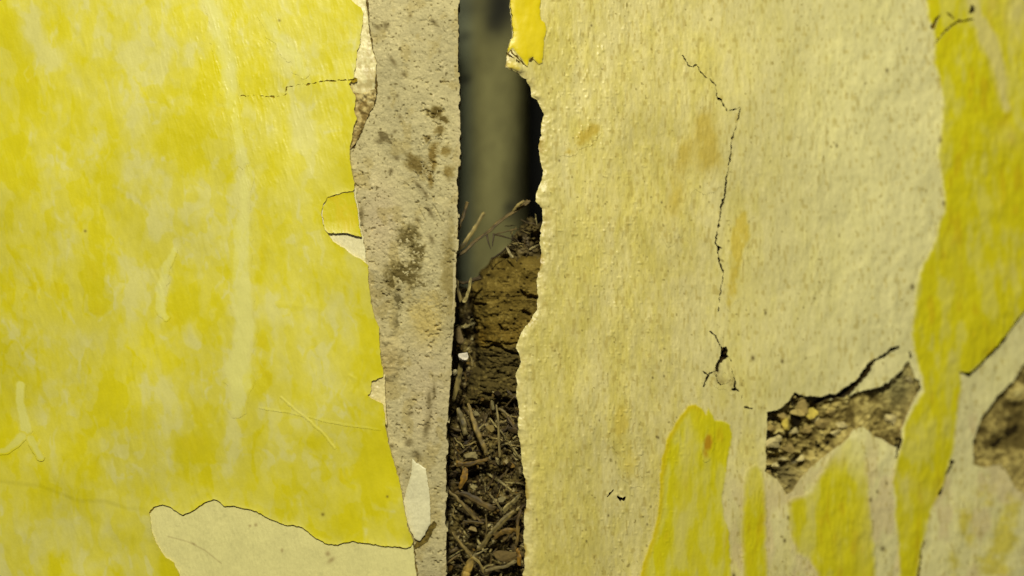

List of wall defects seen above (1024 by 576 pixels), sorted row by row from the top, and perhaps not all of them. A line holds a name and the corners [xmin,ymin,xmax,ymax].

crack [241,78,357,98]
peeling [506,0,547,73]
spalling [150,0,462,576]
water stain [398,100,458,336]
peeling [639,0,1024,576]